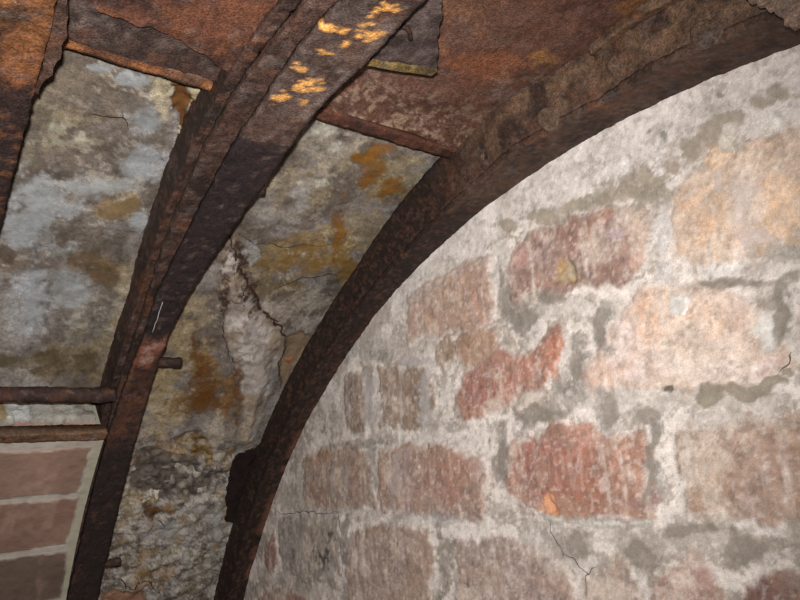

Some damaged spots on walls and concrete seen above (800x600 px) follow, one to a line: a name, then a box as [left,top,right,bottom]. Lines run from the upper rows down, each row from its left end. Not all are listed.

rust [351,142,405,197]
crack [219,231,333,386]
crack [549,520,596,588]